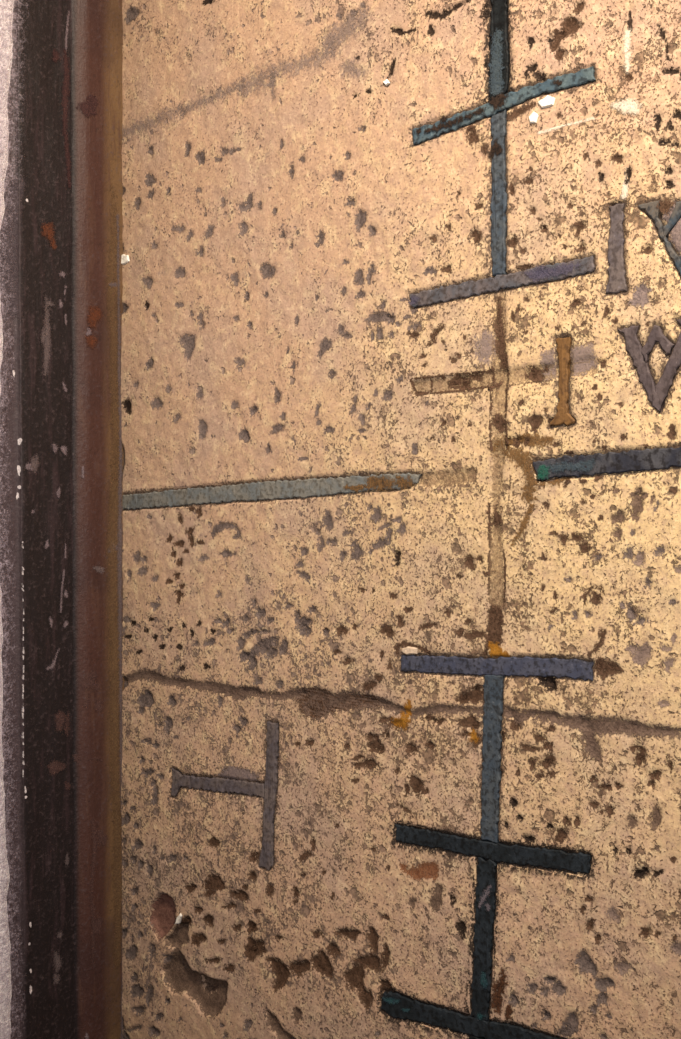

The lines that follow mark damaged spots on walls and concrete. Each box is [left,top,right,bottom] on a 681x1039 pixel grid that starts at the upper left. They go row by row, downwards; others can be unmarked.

crack [122,668,681,765]